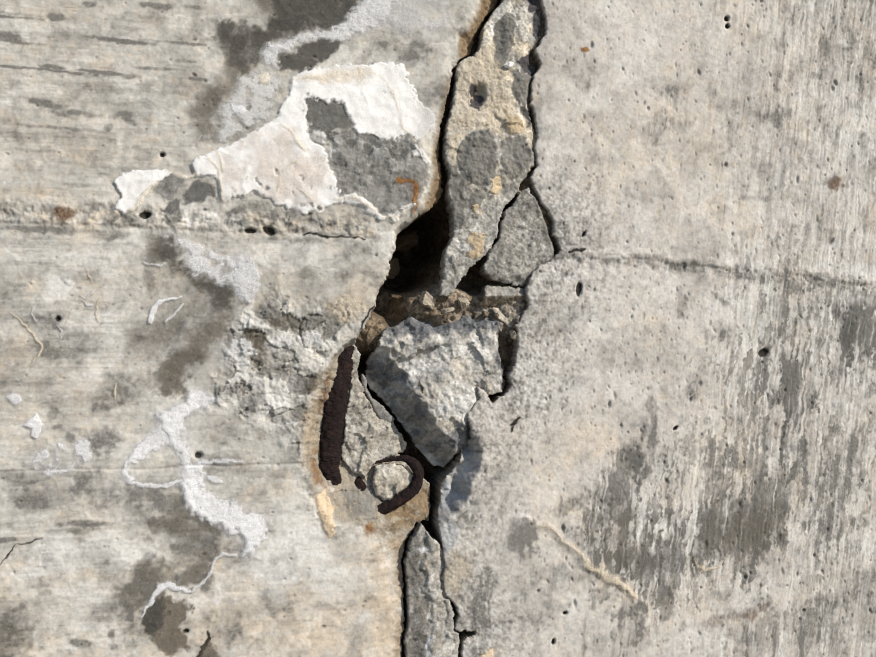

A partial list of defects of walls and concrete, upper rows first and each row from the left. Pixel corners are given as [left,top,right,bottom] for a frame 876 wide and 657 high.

spalling [223,315,321,368]
peeling [114,62,435,222]
leakage [191,0,446,142]
spalling [328,296,367,323]
crack [356,0,527,482]
crack [529,1,545,77]
crack [502,168,586,253]
leakage [836,305,876,366]
leakage [121,235,271,618]
spalling [304,354,430,538]
leakage [585,350,820,601]
crack [388,520,433,657]